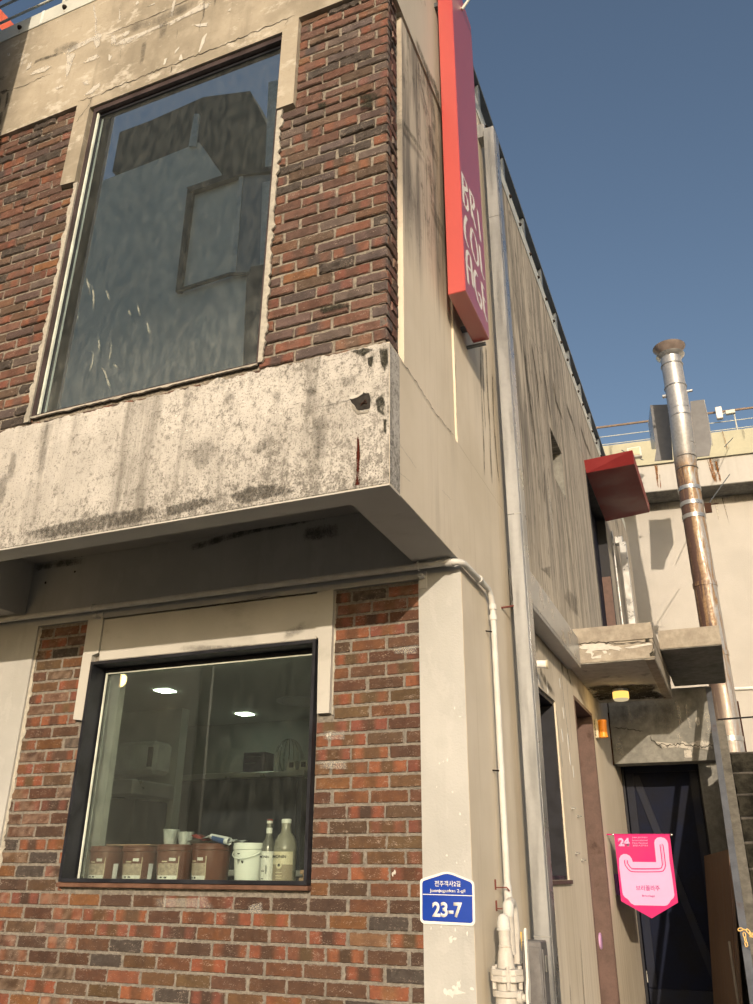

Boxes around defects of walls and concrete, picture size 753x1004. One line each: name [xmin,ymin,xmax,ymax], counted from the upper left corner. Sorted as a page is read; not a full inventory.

crack [77,0,294,121]
spalling [349,391,371,414]
water stain [232,485,293,501]
water stain [29,498,214,540]
peeling [579,638,656,659]